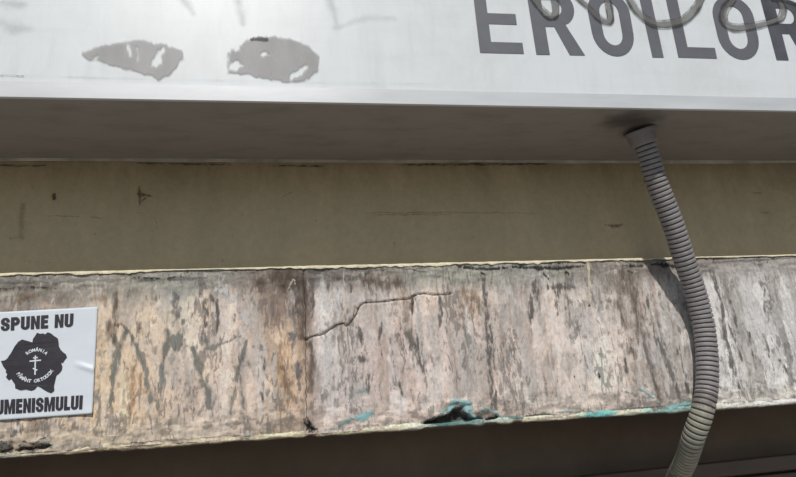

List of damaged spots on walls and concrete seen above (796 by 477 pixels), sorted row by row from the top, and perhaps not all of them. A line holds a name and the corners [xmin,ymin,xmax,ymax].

damp [203,285,235,332]
damp [256,271,333,394]
crack [306,293,448,356]
damp [403,329,427,372]
damp [482,276,497,409]
damp [528,279,575,323]
damp [624,283,690,400]
damp [710,270,745,388]
damp [742,283,789,375]
spalling [423,398,522,424]